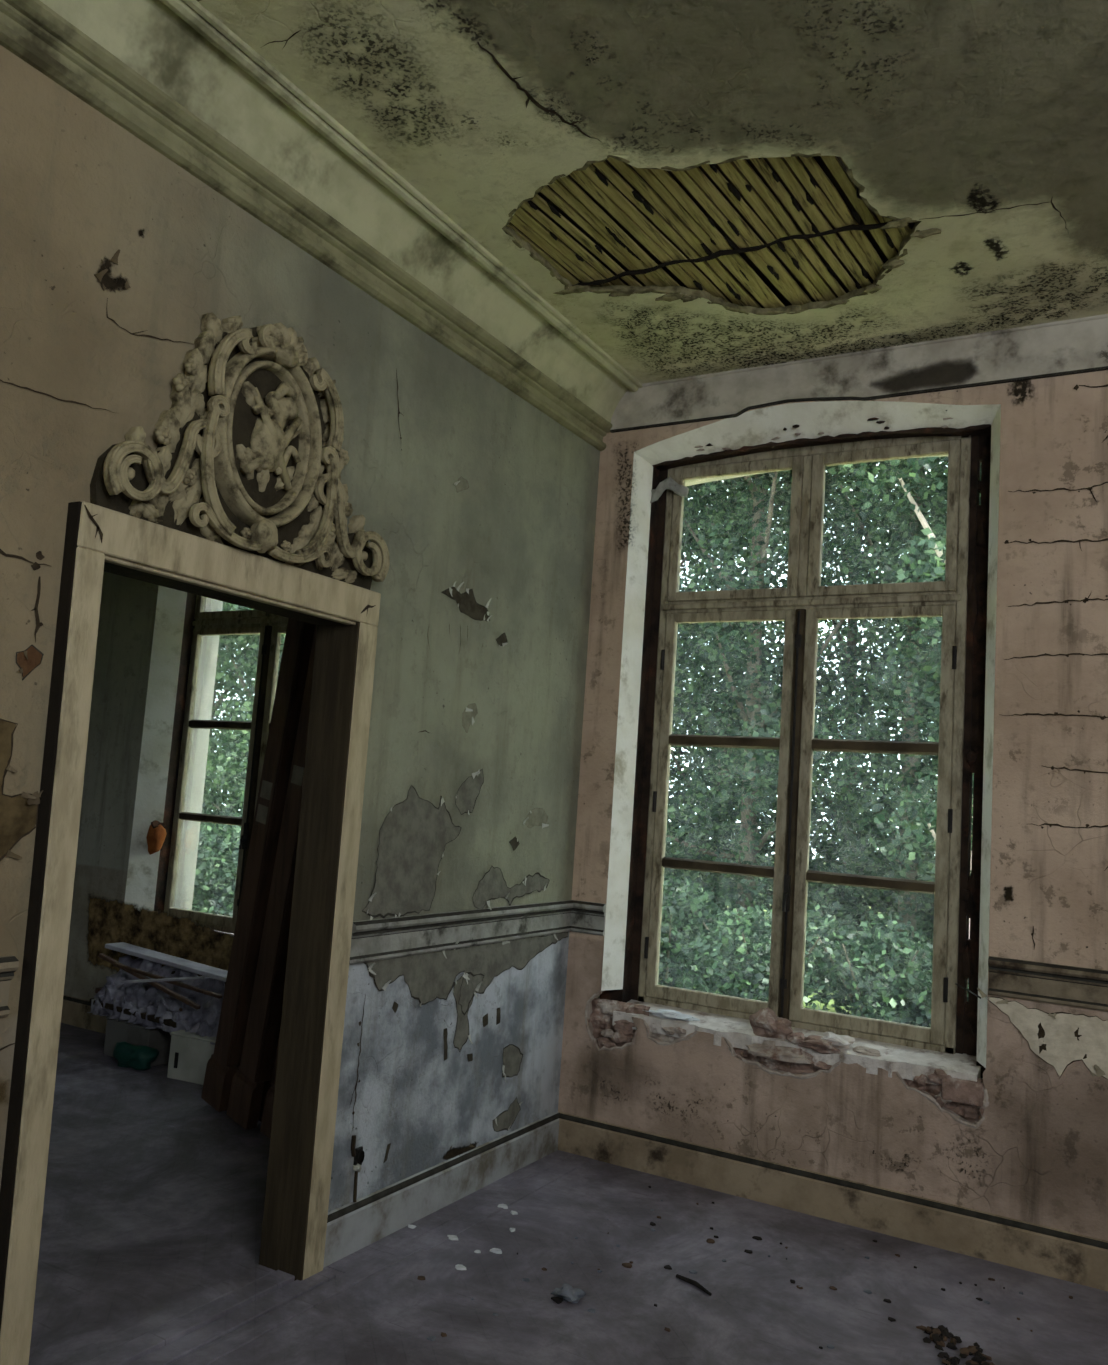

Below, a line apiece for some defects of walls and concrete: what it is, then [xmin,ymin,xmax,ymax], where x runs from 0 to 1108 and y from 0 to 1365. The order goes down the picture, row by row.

water stain [308,11,447,144]
water stain [427,0,1108,374]
water stain [873,361,976,393]
crack [1004,538,1108,549]
crack [0,549,52,643]
peeling [441,581,492,621]
crack [1008,591,1108,607]
crack [999,710,1108,720]
peeling [0,718,43,861]
peeling [364,932,568,1062]
spalling [585,990,698,1051]
peeling [977,988,1108,1079]